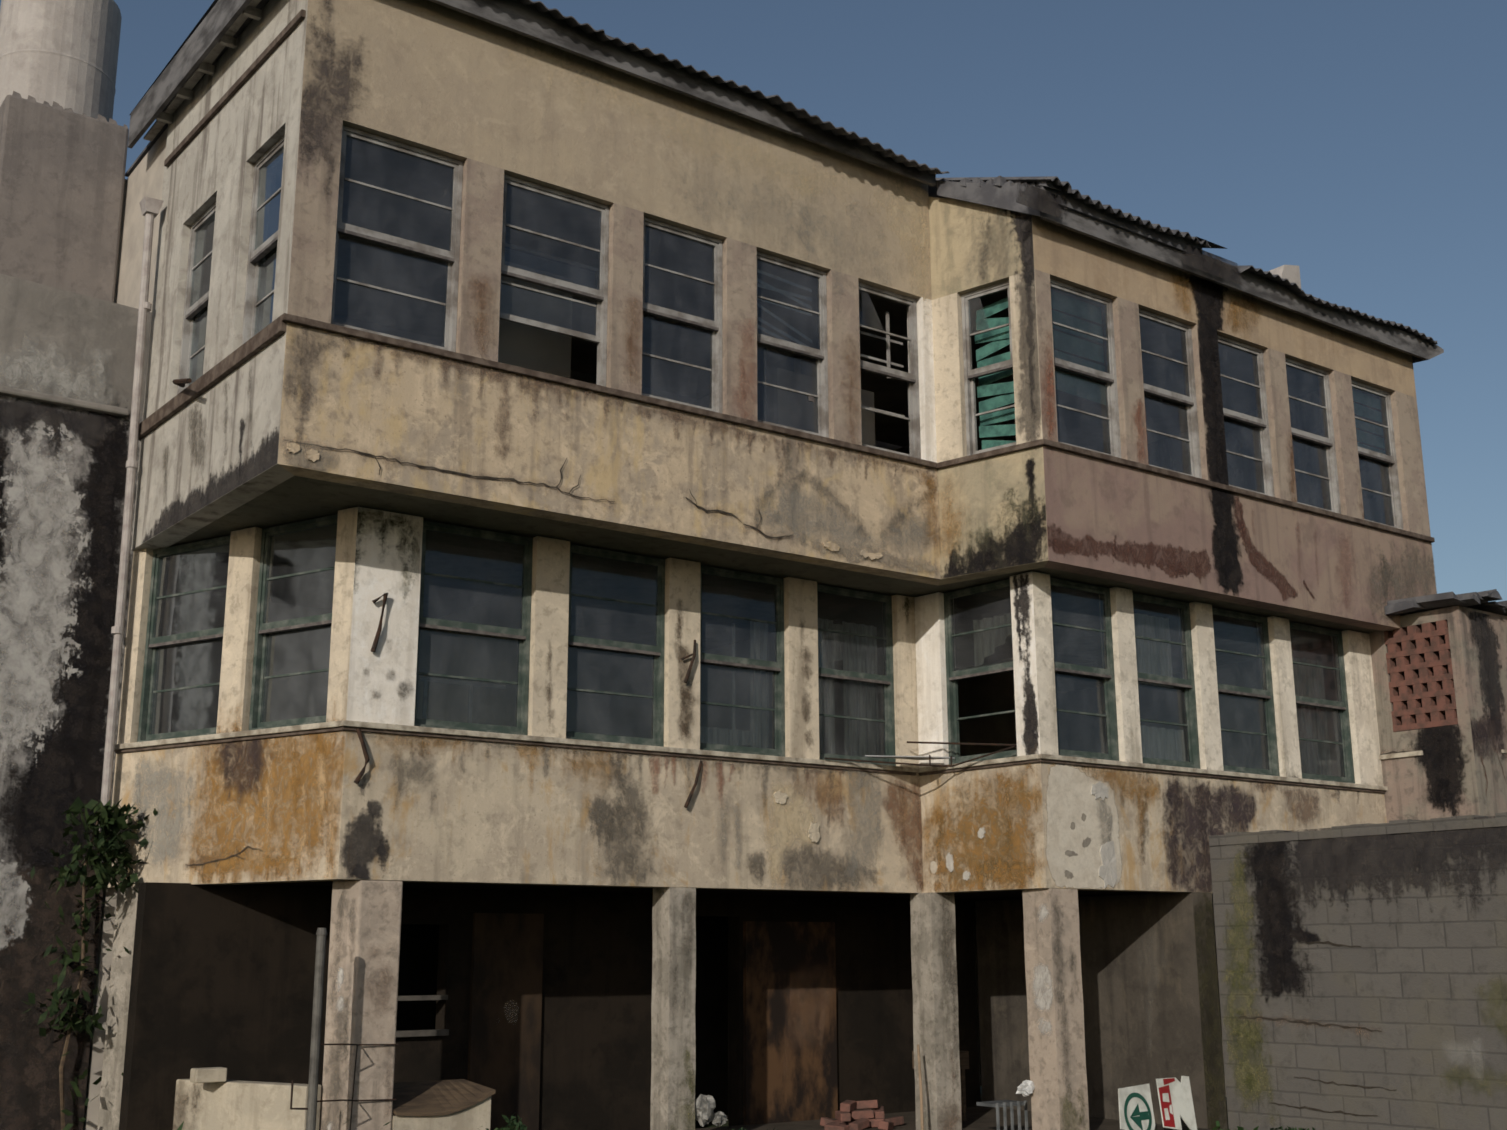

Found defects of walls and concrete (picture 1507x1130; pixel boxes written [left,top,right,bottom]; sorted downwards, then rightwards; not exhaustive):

water stain [300,26,361,194]
water stain [1004,183,1067,441]
water stain [143,406,279,543]
crack [285,440,615,502]
crack [686,489,805,541]
water stain [941,244,1314,755]
water stain [0,346,137,1130]
rust [190,723,344,883]
water stain [341,779,389,879]
rust [883,765,1041,892]
peeling [1046,764,1122,889]
water stain [1142,612,1507,1130]